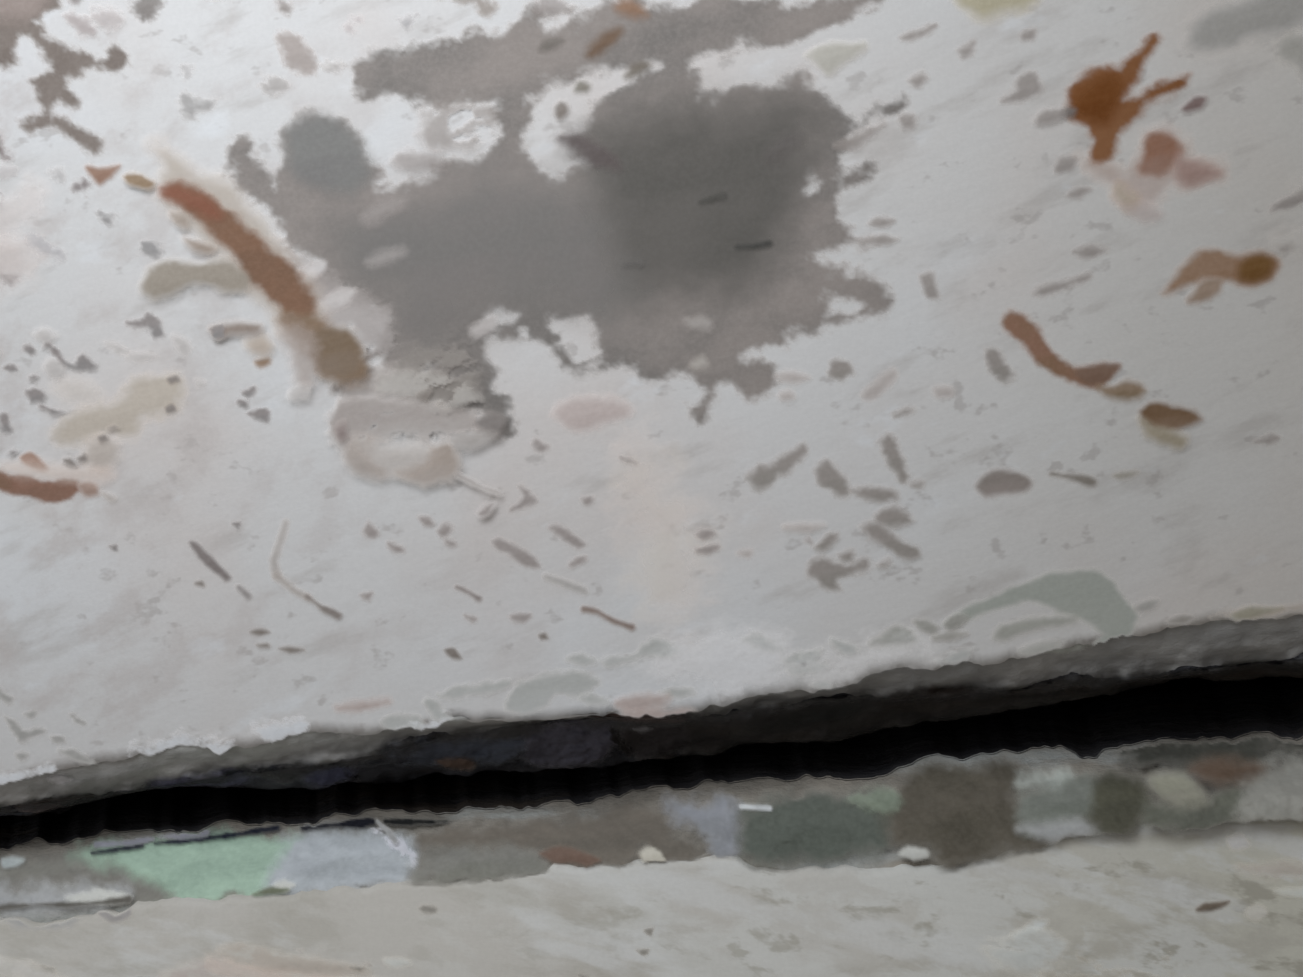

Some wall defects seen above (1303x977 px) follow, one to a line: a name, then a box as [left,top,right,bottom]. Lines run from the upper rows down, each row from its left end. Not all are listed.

leakage [956,0,1037,19]
leakage [807,42,866,75]
corrosion [1064,33,1227,219]
corrosion [85,148,368,385]
corrosion [1164,249,1280,304]
corrosion [1001,311,1202,449]
leakage [555,397,630,430]
peeling [0,689,94,784]
peeling [139,735,230,755]
peeling [256,718,308,741]
crack [0,614,1303,928]
spalling [1196,901,1230,912]